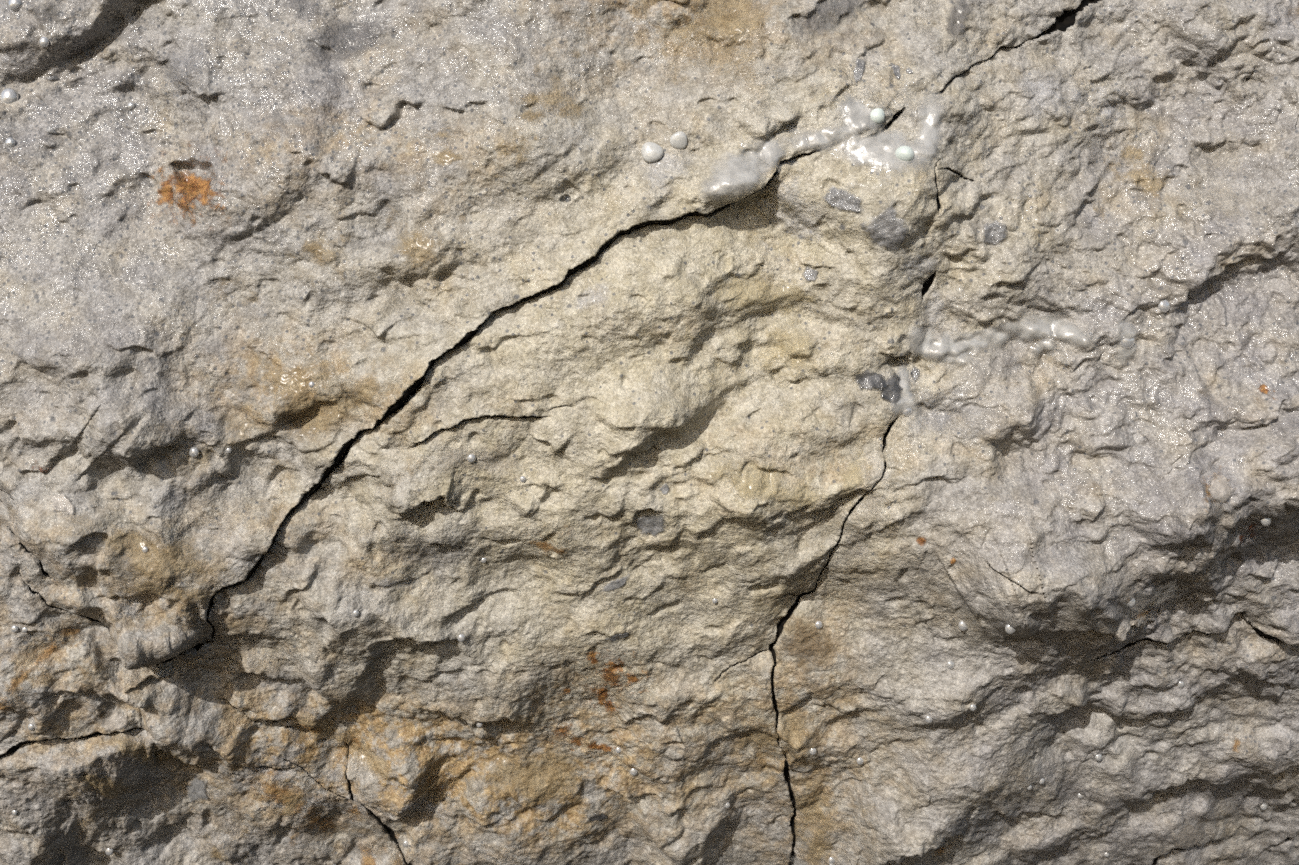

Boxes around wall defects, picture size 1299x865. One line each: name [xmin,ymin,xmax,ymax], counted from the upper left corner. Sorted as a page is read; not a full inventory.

crack [930,0,1102,94]
corrosion [148,169,221,215]
damp [704,99,941,200]
crack [880,110,903,133]
damp [717,280,771,306]
crack [922,272,936,300]
damp [763,330,812,367]
crack [156,145,833,666]
crack [1,490,100,622]
crack [714,420,895,865]
crack [0,728,143,758]
crack [209,743,413,865]